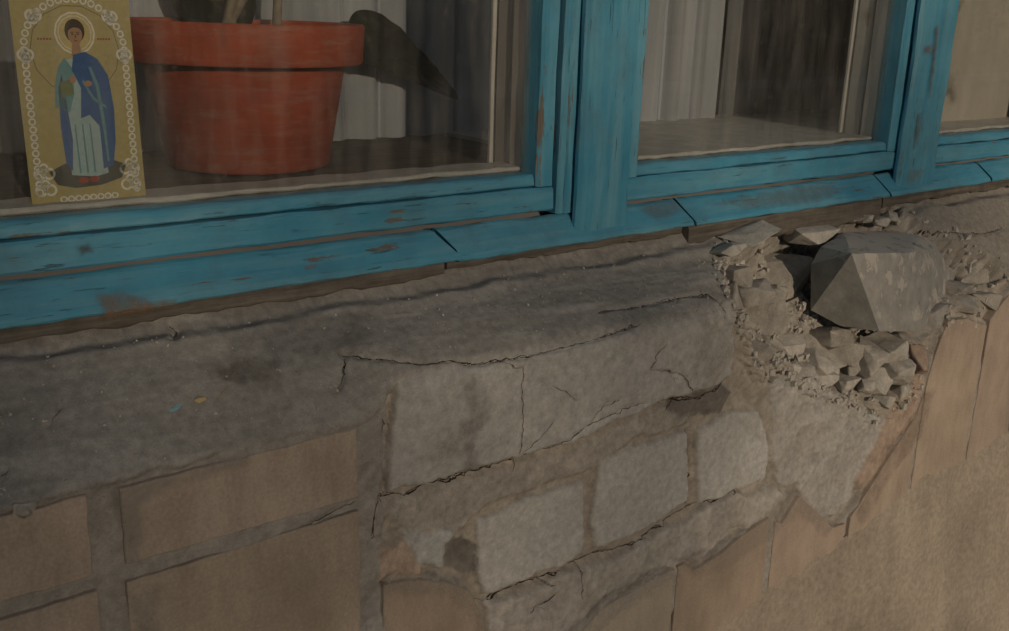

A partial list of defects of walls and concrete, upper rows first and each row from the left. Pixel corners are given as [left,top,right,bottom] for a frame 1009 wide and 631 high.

crack [308,294,725,539]
crack [474,464,757,612]
spalling [380,204,1009,631]